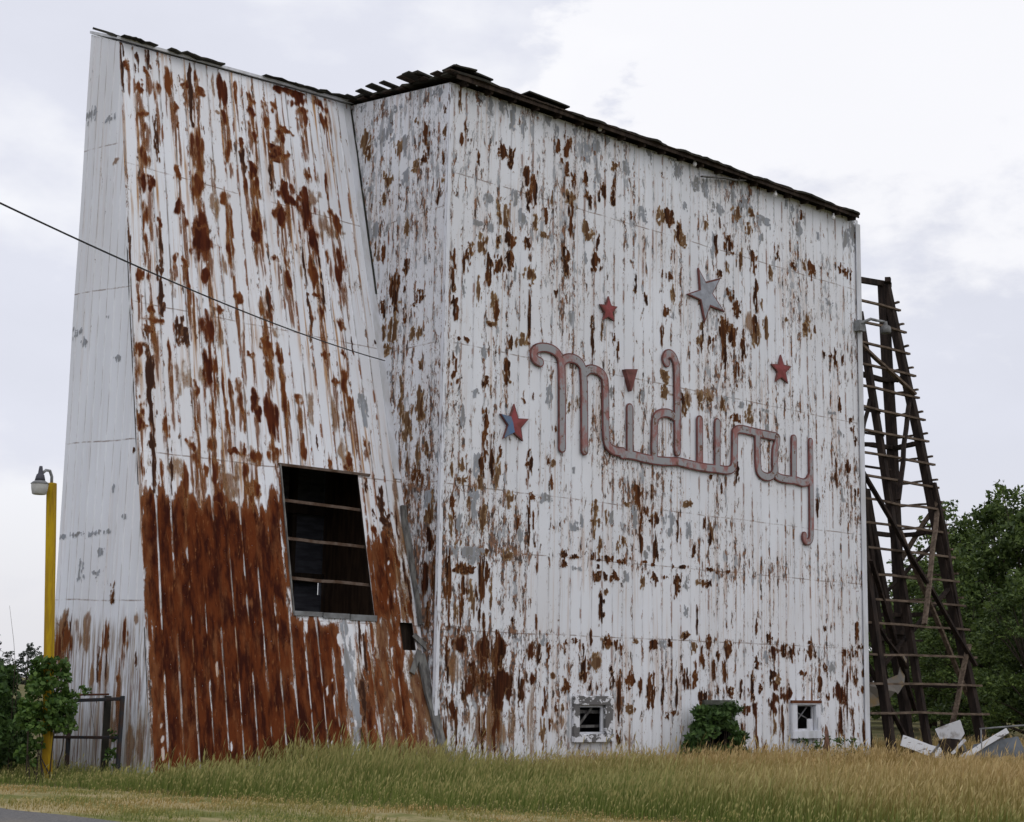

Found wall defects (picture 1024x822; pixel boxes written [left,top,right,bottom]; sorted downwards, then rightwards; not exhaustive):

rust [54,608,73,688]
rust [96,42,436,776]
peeling [387,371,865,756]